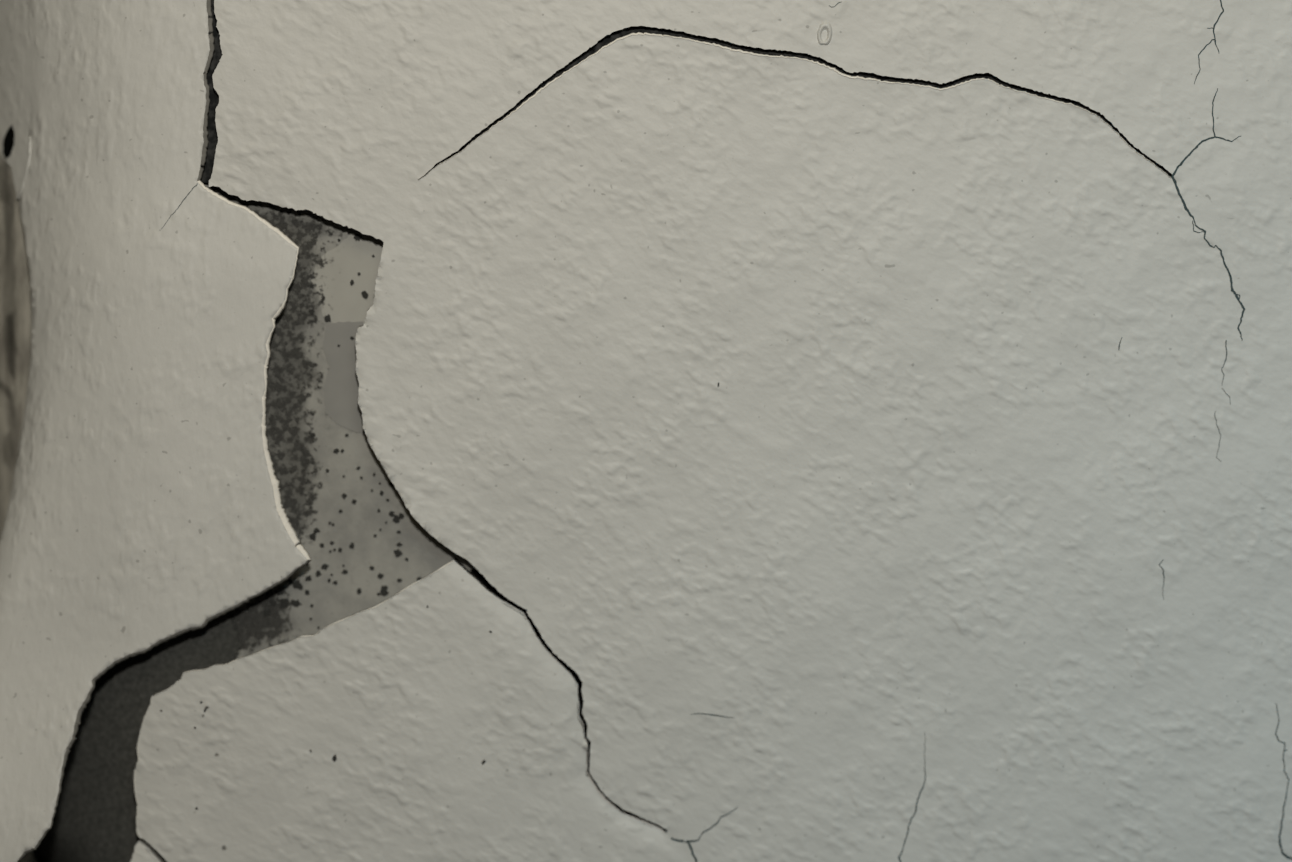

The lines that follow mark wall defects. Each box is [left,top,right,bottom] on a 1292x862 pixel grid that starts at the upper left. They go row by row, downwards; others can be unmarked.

crack [200,0,223,183]
crack [419,0,1245,461]
peeling [0,0,476,862]
crack [137,839,167,862]
crack [455,558,735,862]